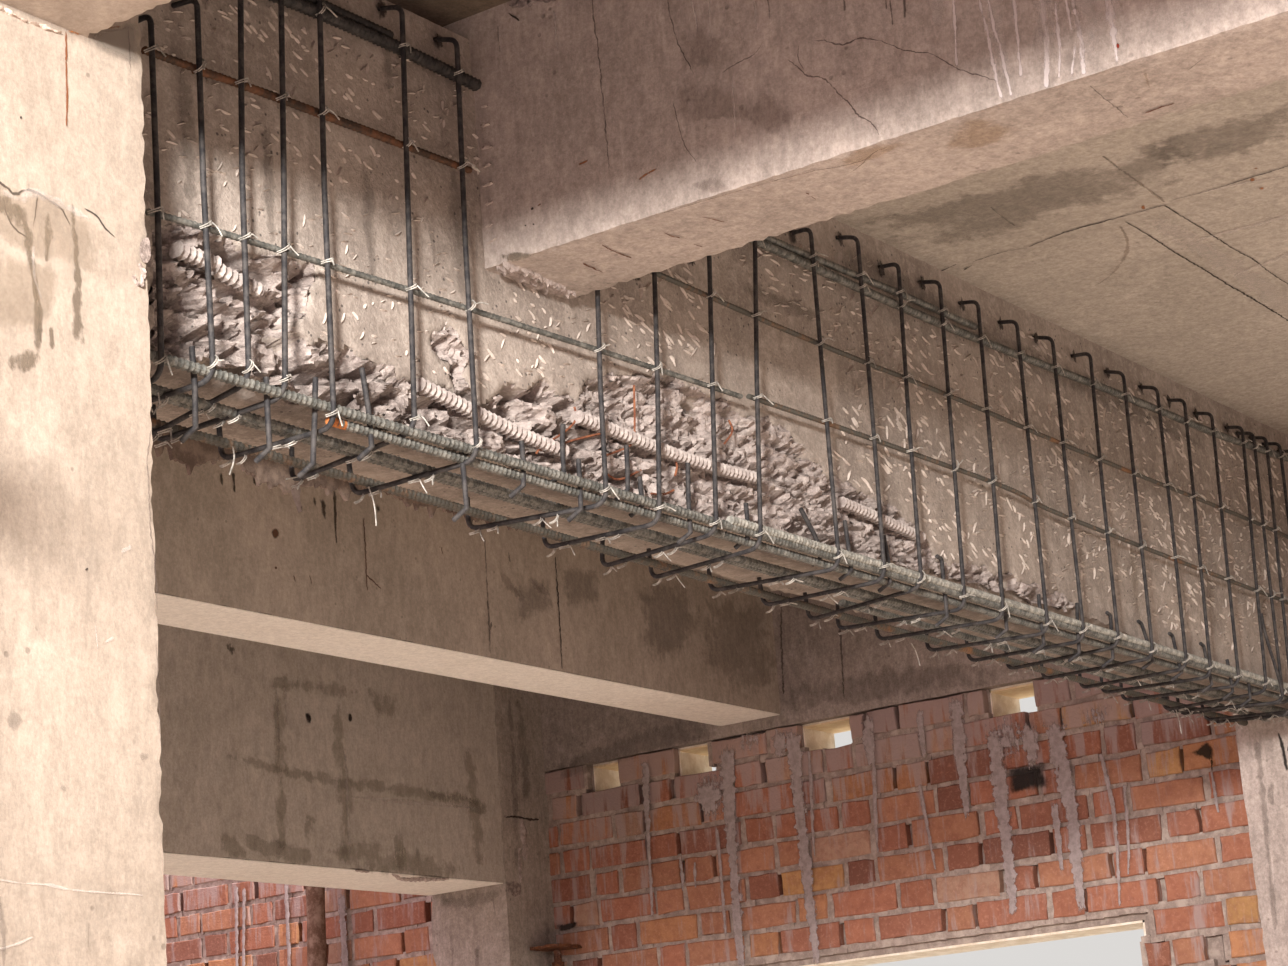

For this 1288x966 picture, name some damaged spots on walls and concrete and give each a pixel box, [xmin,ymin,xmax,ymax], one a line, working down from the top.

crack [592,0,609,159]
crack [790,37,994,135]
water stain [0,196,54,371]
crack [0,182,114,238]
water stain [72,208,84,339]
spalling [132,224,1075,612]